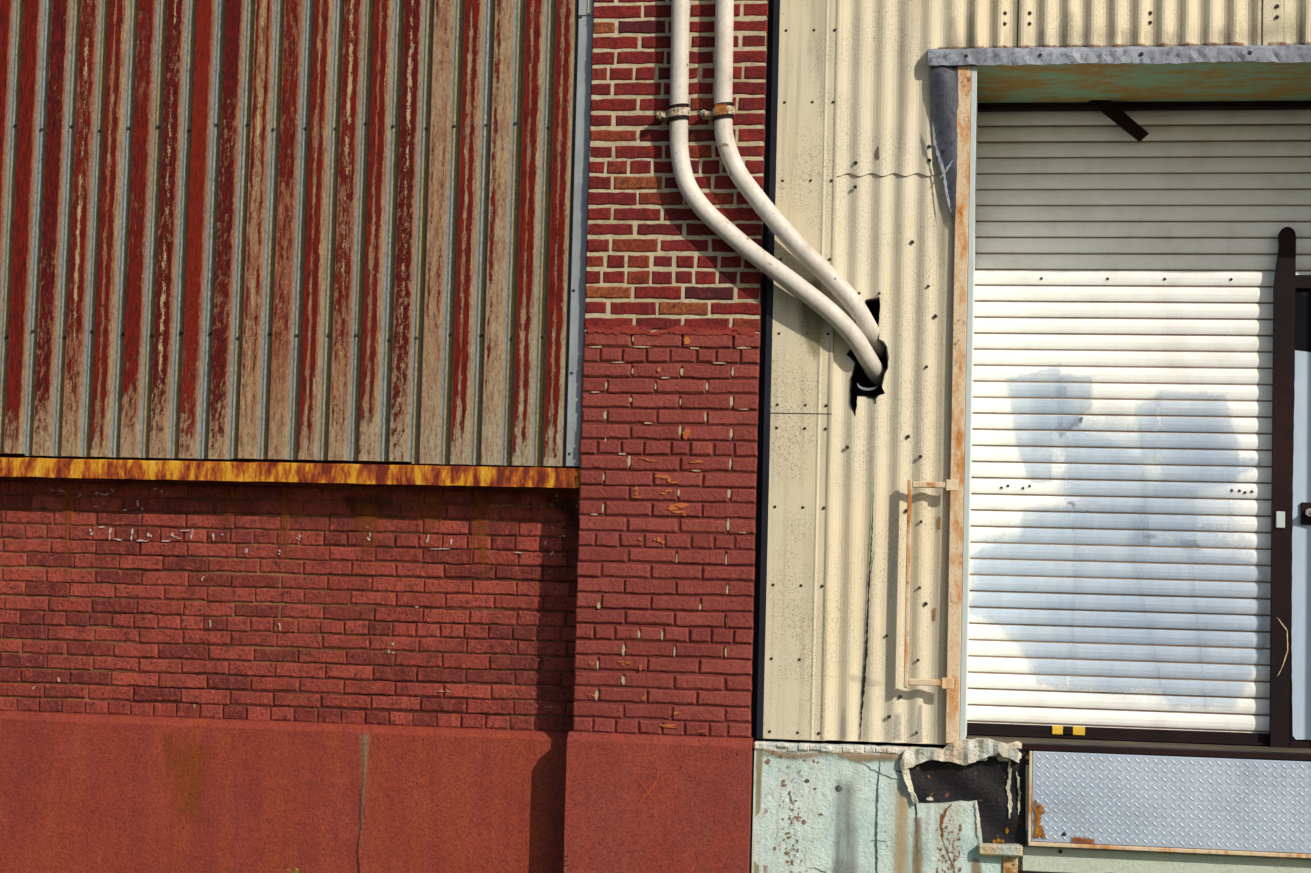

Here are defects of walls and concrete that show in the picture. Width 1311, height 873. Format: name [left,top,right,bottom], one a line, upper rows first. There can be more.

hole [846,297,889,415]
crack [858,482,917,873]
crack [357,735,365,873]
rust [940,804,955,873]
spalling [900,738,1026,873]